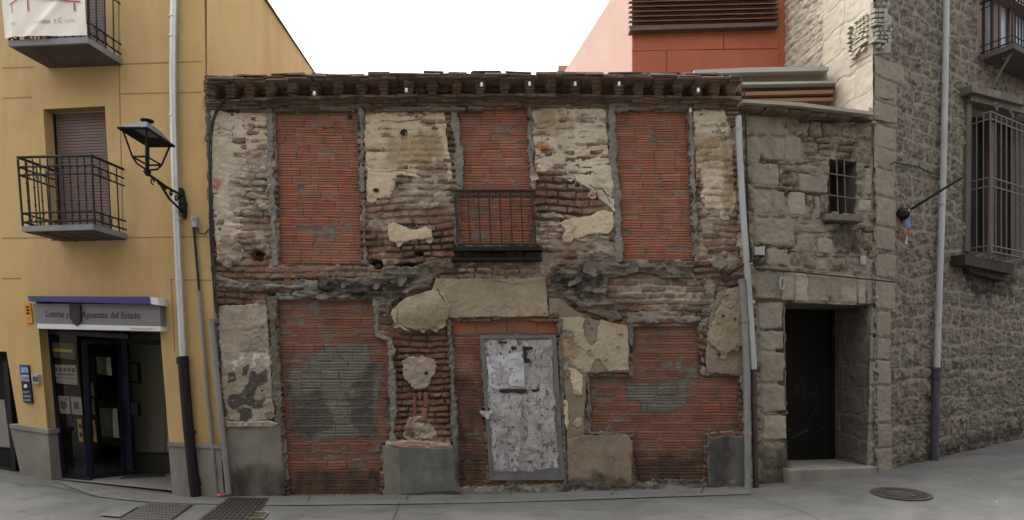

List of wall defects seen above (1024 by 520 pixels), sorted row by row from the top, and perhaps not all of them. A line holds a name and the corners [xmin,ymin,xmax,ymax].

peeling [210,105,743,487]